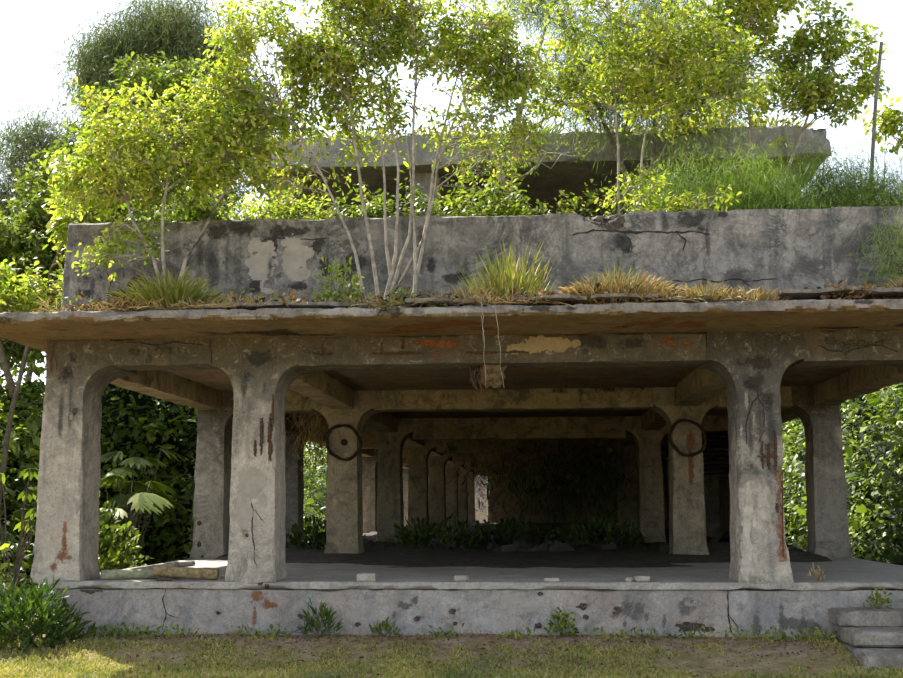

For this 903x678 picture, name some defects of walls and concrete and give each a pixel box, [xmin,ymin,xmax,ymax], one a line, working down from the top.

crack [573,229,710,254]
rust [368,320,497,358]
peeling [466,335,581,355]
spalling [233,399,242,447]
spalling [253,394,275,461]
rust [50,522,72,571]
crack [251,503,265,565]
rust [251,591,277,624]